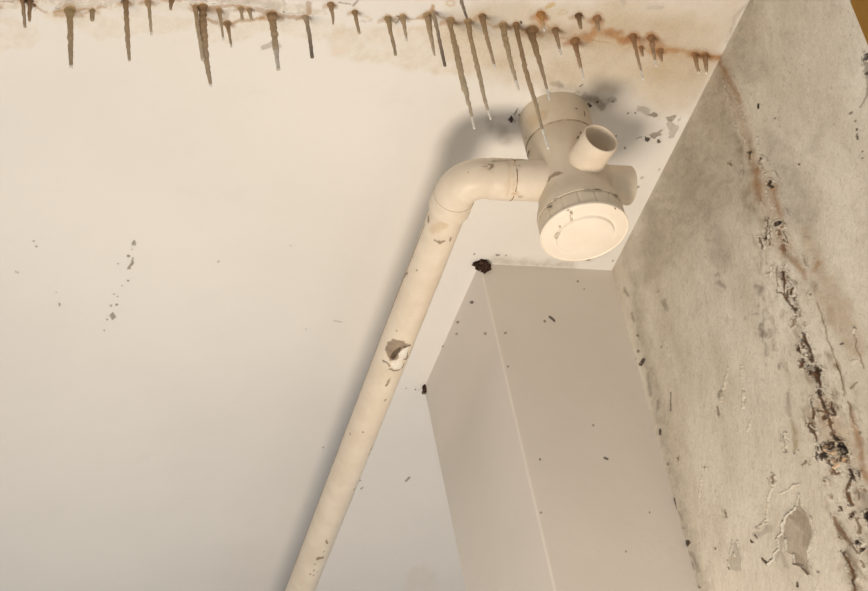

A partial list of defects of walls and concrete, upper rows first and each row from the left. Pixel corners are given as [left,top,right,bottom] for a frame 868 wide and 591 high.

water stain [0,0,210,55]
peeling [634,104,683,145]
corrosion [534,0,868,366]
crack [726,147,778,191]
water stain [207,0,773,591]
water stain [743,282,783,371]
crack [755,215,866,445]
corrosion [807,392,868,485]
peeling [726,492,821,588]
spalling [798,438,868,554]